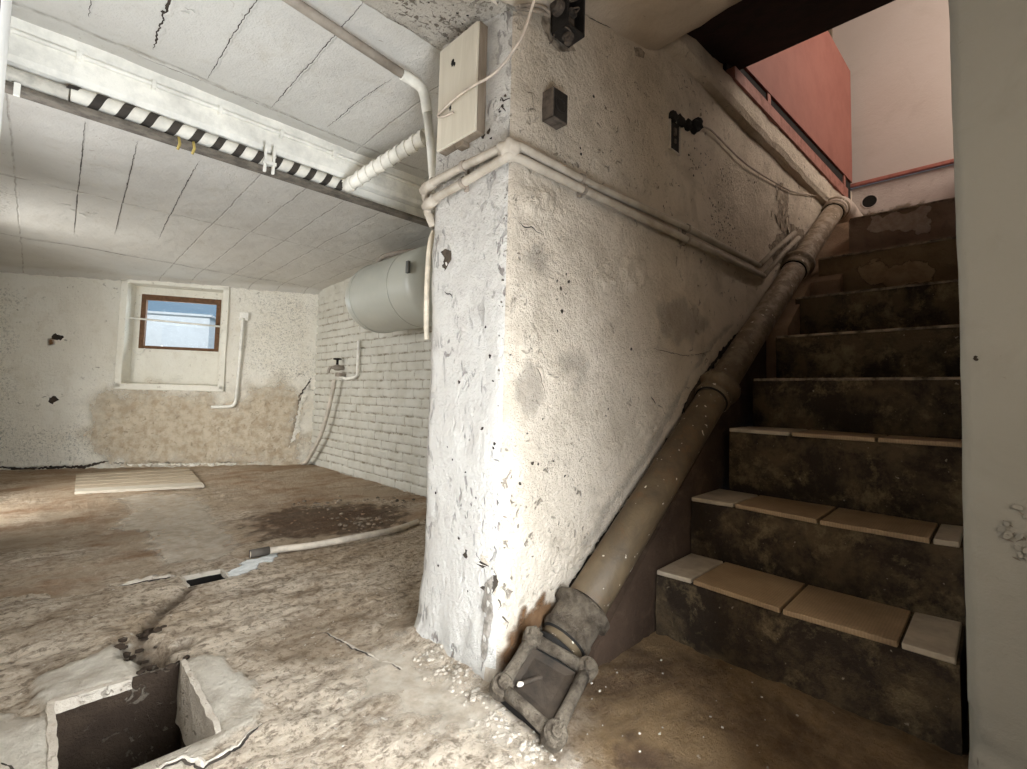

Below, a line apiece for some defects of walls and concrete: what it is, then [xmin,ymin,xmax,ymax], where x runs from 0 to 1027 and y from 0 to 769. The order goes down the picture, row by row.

crack [140,0,392,144]
damp [92,386,304,468]
damp [239,504,407,542]
crack [119,574,176,586]
damp [227,553,278,577]
crack [152,723,263,769]